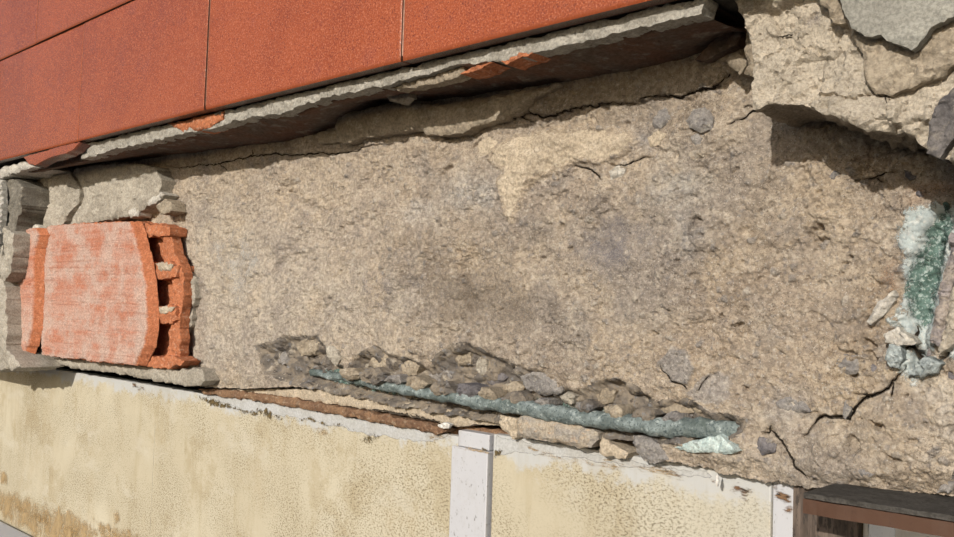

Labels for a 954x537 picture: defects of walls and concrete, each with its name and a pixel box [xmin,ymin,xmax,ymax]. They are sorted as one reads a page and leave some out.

peeling [392,66,471,93]
spalling [24,142,91,168]
peeling [477,127,632,219]
peeling [647,131,666,147]
spalling [883,232,954,377]
leakage [886,200,954,386]
spalling [253,335,749,441]
spalling [657,436,702,445]
crack [765,325,924,479]